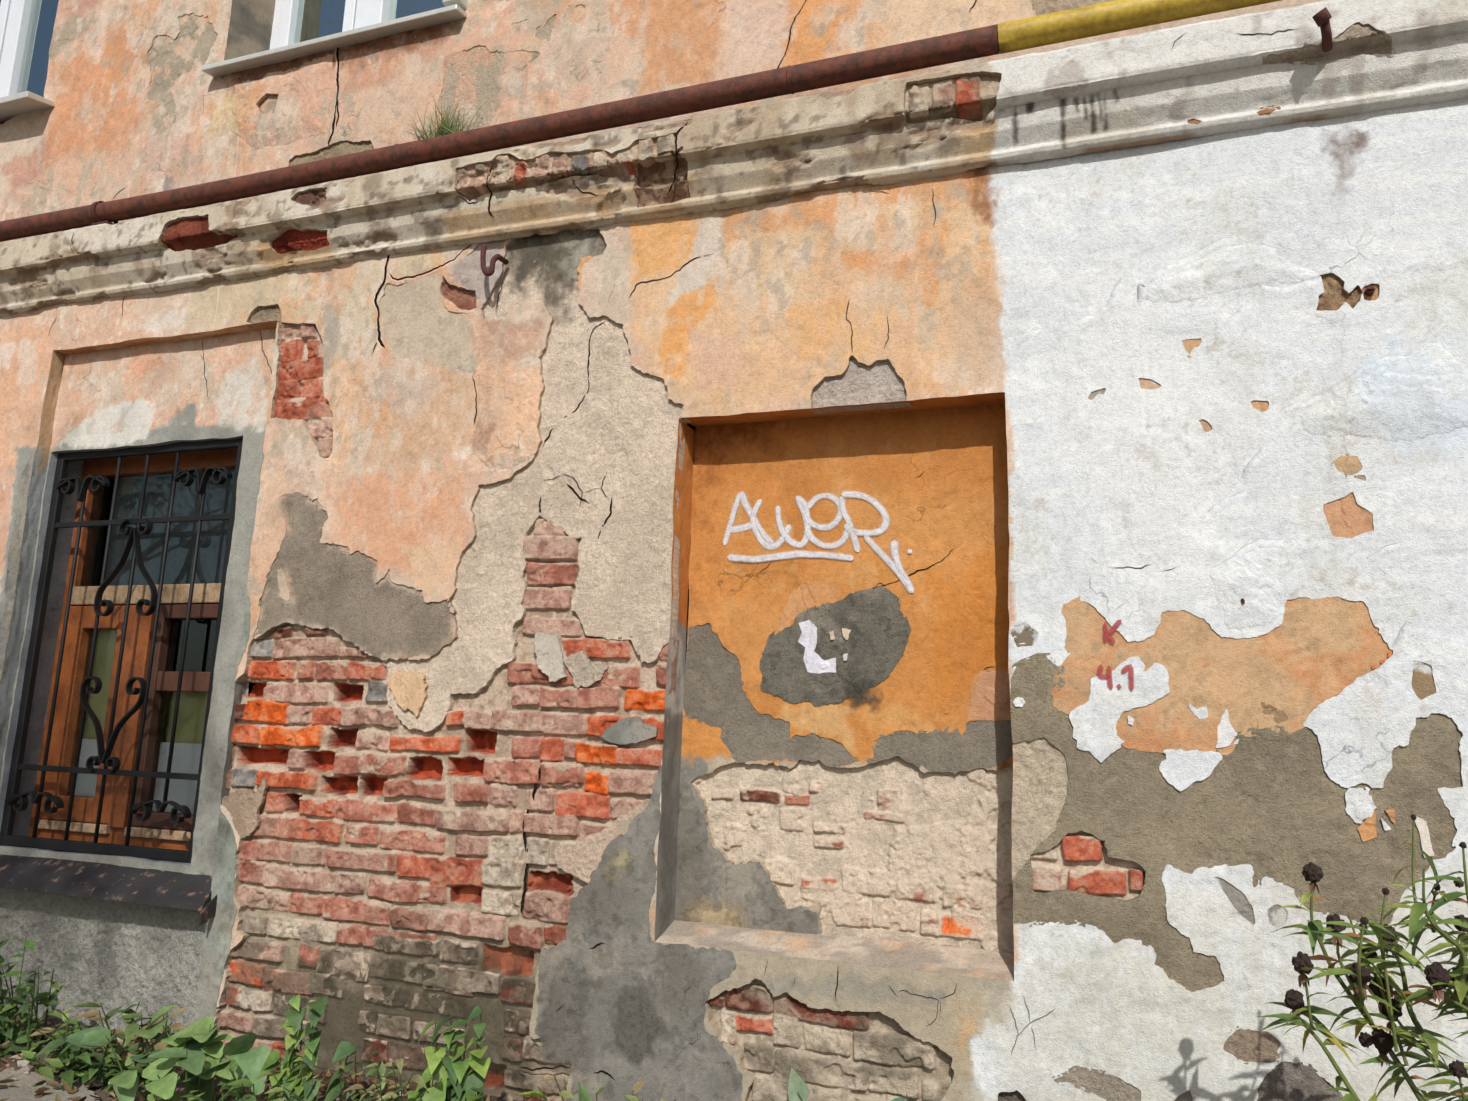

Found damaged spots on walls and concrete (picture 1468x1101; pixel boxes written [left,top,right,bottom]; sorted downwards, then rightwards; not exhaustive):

crack [777,0,810,68]
spalling [1032,0,1114,16]
crack [326,48,339,146]
spalling [456,134,690,207]
crack [372,165,494,351]
spalling [216,229,1462,1101]